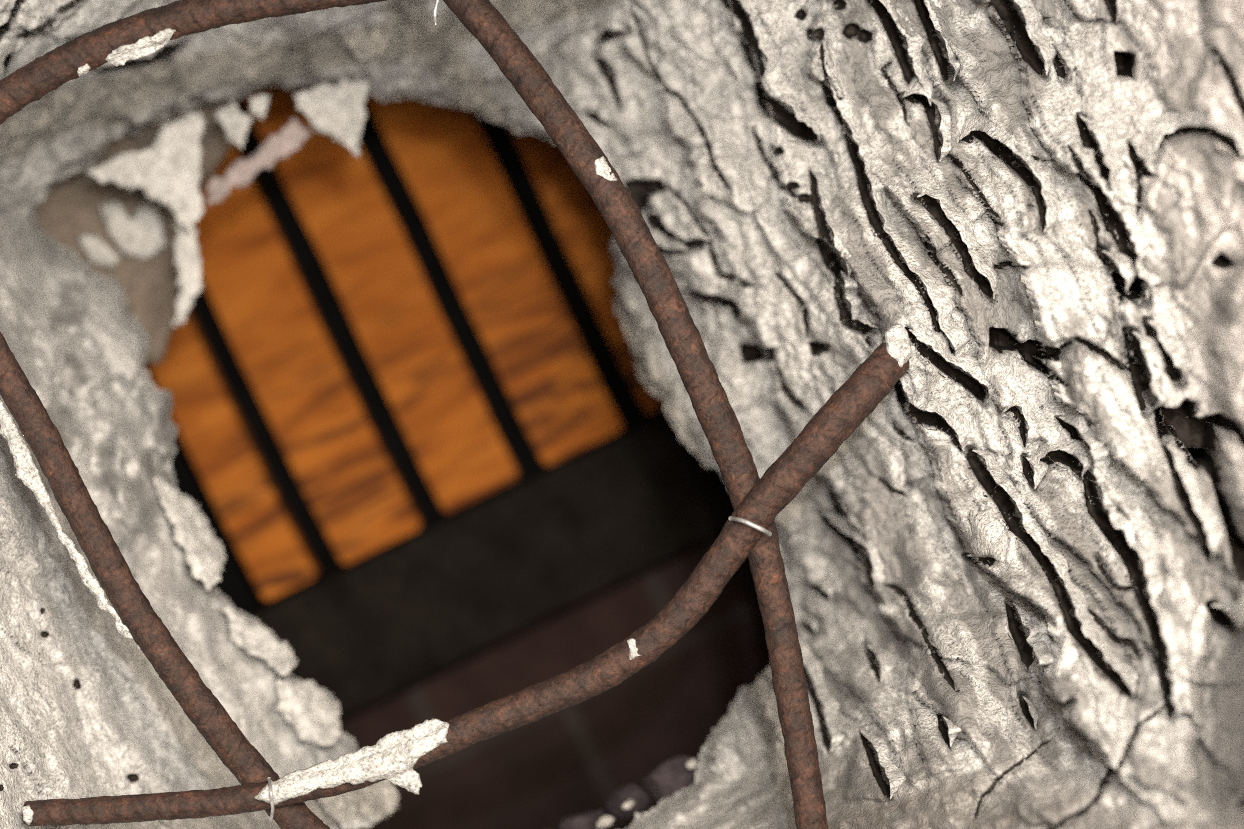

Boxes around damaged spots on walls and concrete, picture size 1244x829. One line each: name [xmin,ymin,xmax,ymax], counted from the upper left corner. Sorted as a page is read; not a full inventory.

spalling [0,0,912,829]
crack [585,4,728,188]
crack [647,0,1244,829]